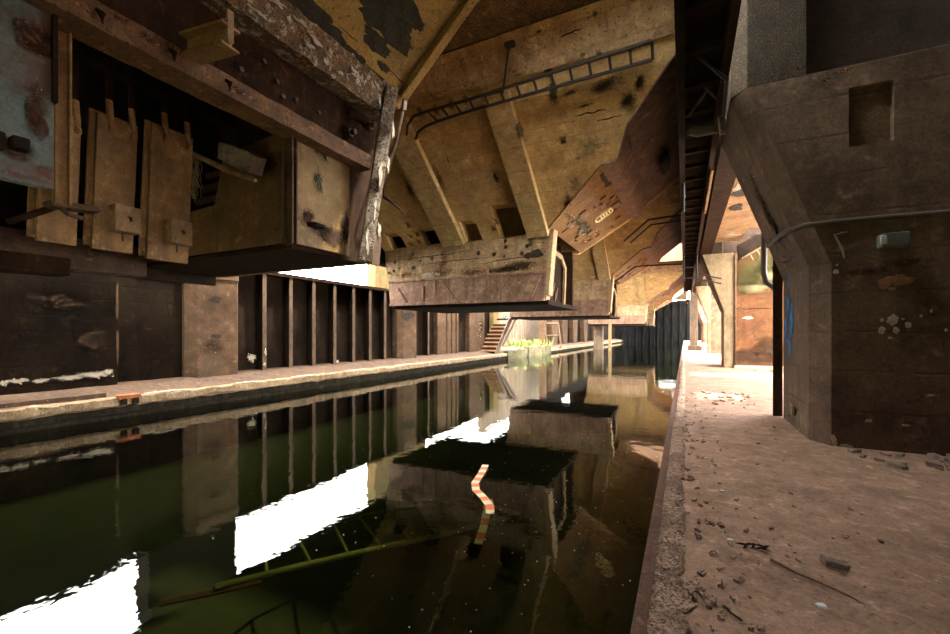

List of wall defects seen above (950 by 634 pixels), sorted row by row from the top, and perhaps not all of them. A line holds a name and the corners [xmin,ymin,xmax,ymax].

corrosion [12,17,52,58]
peeling [270,0,424,106]
corrosion [3,85,49,161]
peeling [365,156,390,257]
corrosion [298,209,349,247]
spalling [524,249,544,259]
spalling [878,309,933,339]
damp [0,369,113,385]